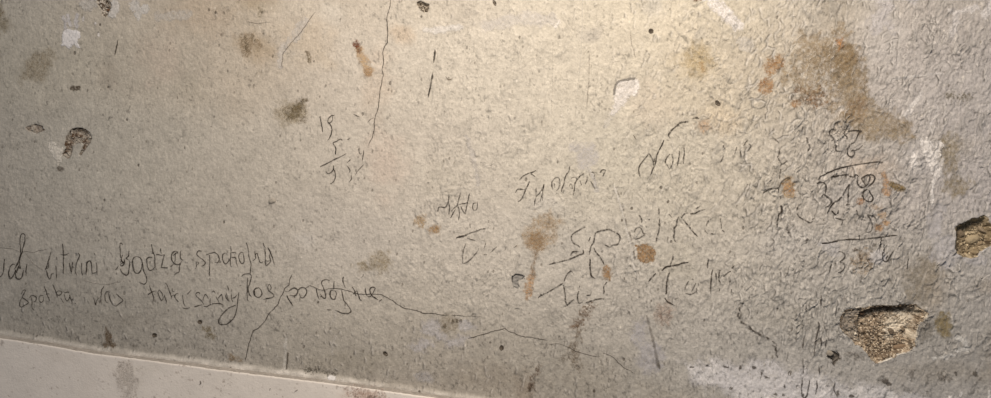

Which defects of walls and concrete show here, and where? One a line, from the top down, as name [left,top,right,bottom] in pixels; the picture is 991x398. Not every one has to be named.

crack [351,0,391,178]
water stain [781,26,914,139]
spalling [62,127,92,159]
spalling [955,215,991,258]
crack [245,275,633,373]
spalling [839,304,929,364]